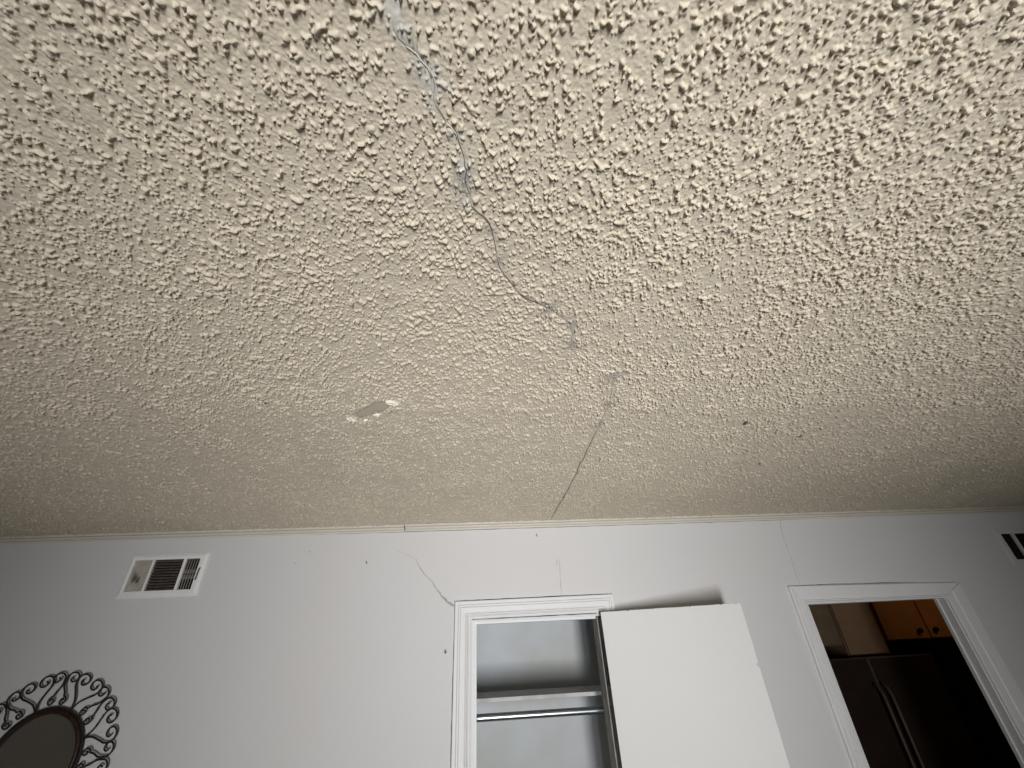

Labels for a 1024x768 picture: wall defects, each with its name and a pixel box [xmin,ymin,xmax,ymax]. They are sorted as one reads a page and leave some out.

crack [385,0,616,519]
peeling [347,400,399,422]
crack [398,525,454,607]